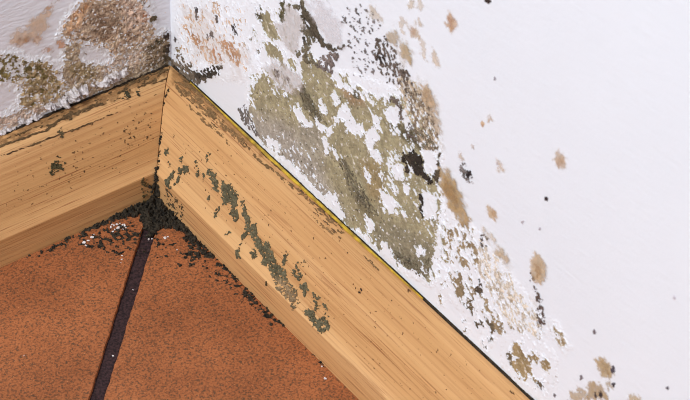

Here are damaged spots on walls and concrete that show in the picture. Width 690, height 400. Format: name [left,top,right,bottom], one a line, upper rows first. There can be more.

water stain [0,2,344,334]
water stain [271,64,393,238]
water stain [341,4,473,225]
water stain [390,229,438,278]
water stain [475,228,546,337]
water stain [570,357,616,400]